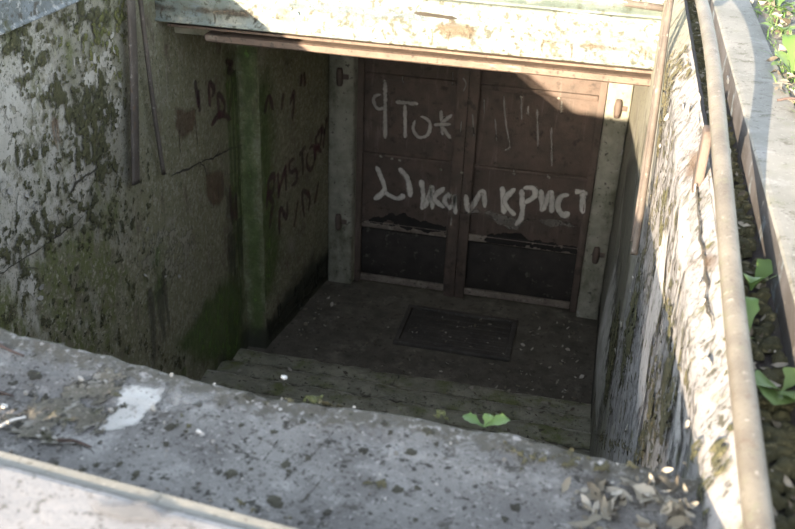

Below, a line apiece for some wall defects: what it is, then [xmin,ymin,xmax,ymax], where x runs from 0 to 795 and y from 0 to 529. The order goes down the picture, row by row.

corrosion [431,21,475,41]
crack [172,145,242,177]
leakage [632,201,693,460]
leakage [660,376,681,475]